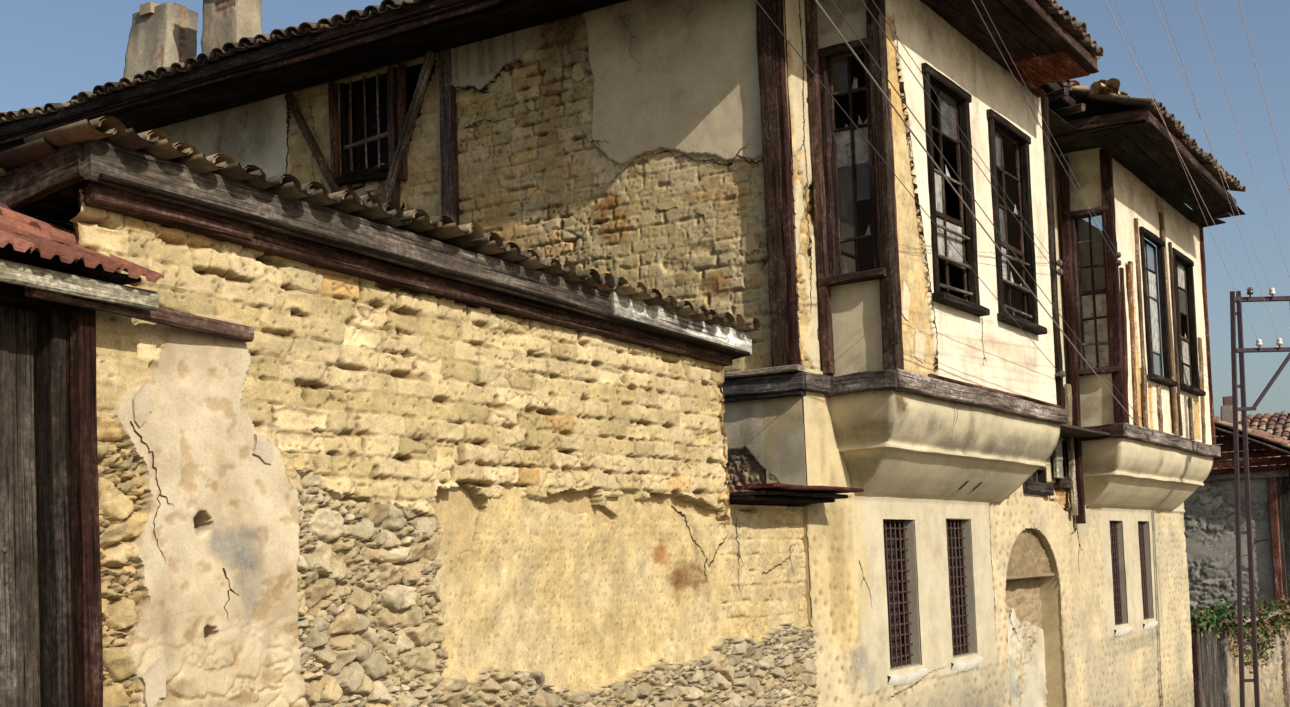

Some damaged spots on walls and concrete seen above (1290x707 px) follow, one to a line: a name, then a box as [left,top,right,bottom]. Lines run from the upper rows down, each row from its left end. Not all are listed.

crack [286,100,321,182]
spalling [351,163,386,199]
flaking render [456,13,772,372]
crack [614,140,763,178]
crack [130,421,175,564]
crack [671,505,800,598]
flaking render [1007,609,1048,707]